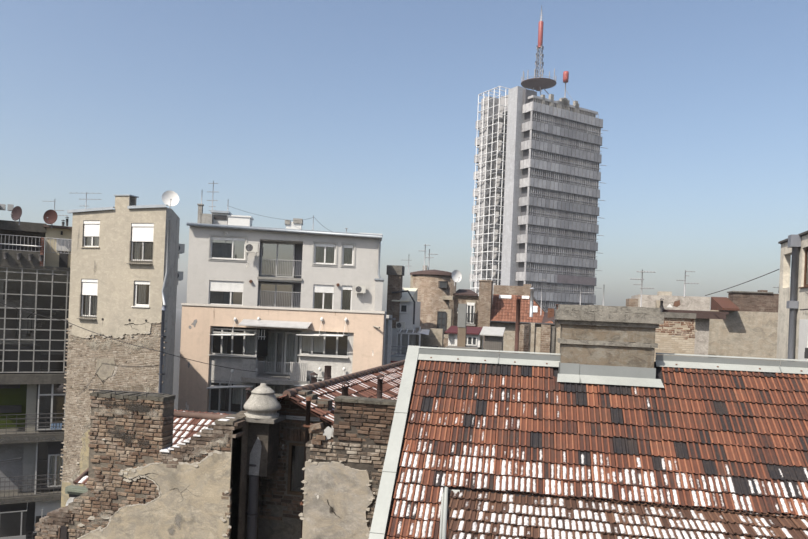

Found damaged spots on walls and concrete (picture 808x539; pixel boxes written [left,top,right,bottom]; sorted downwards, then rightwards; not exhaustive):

flaking render [35,318,232,539]
flaking render [302,422,387,537]